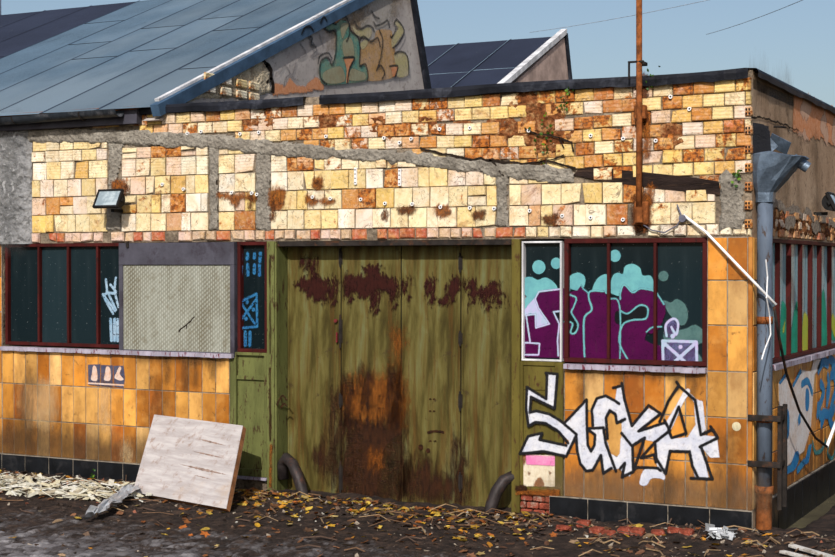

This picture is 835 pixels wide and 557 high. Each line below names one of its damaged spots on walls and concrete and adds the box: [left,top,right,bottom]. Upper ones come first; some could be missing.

crack [262,60,275,93]
peeling [793,93,835,146]
corrosion [217,192,256,210]
corrosion [268,185,286,221]
corrosion [305,176,335,206]
corrosion [381,205,417,222]
corrosion [435,203,451,218]
corrosion [472,209,486,220]
spalling [773,198,835,241]
corrosion [293,254,412,315]
corrosion [424,271,509,313]
corrosion [312,329,471,506]